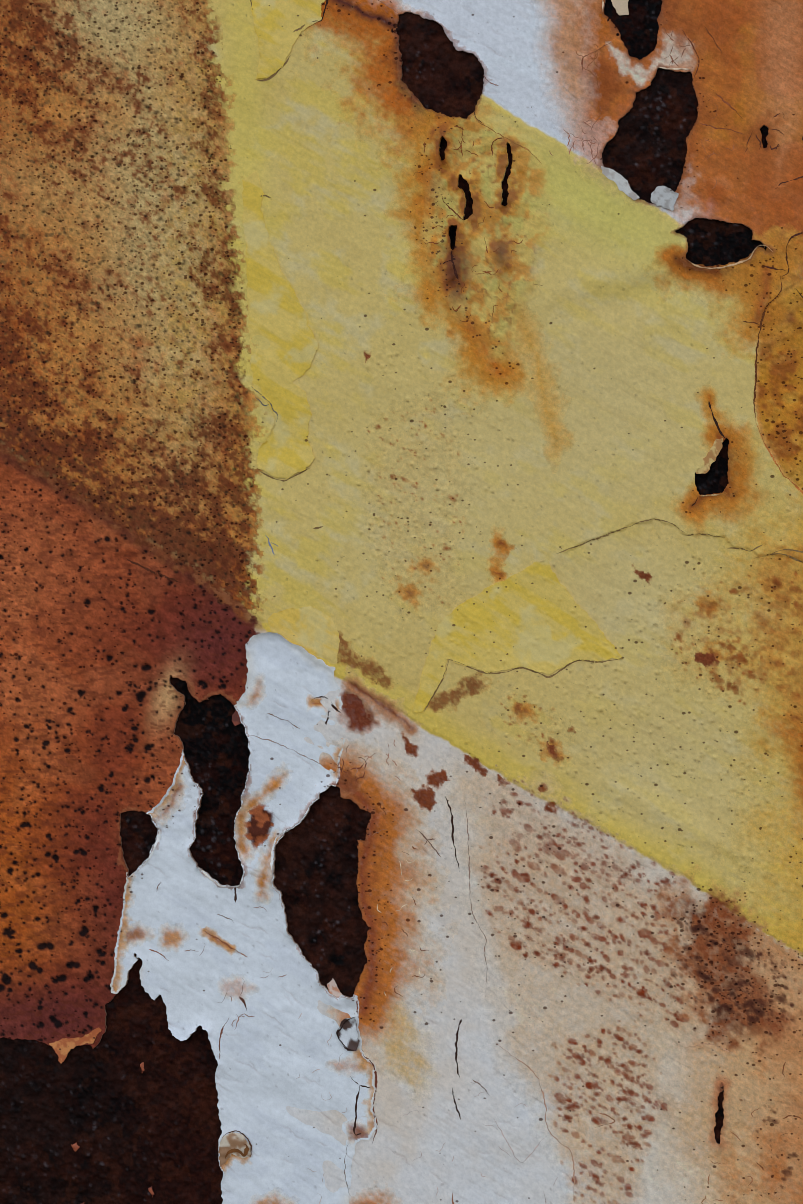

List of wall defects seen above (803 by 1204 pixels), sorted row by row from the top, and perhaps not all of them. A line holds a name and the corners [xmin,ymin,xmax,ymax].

peeling [391,13,484,119]
peeling [563,0,773,269]
peeling [695,438,729,496]
rust [0,0,274,1053]
crack [557,498,803,563]
rust [187,0,803,1204]
crack [425,658,622,710]
peeling [0,606,378,1204]
crack [701,1087,803,1204]